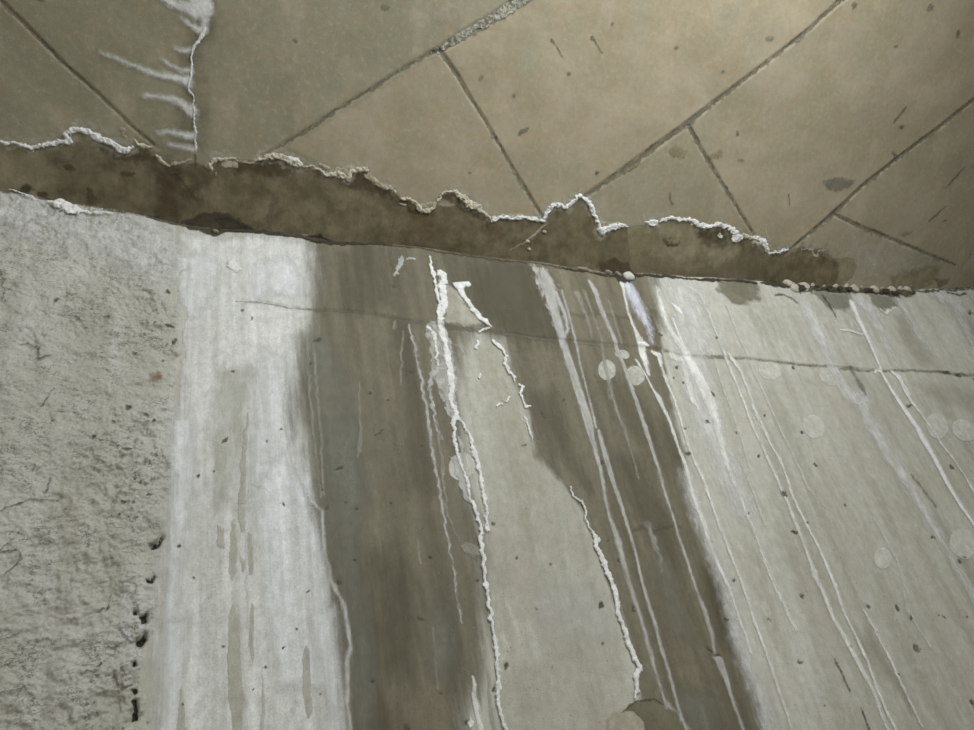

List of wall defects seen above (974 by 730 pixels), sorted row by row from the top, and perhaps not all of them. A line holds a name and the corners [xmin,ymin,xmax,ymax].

spalling [782,280,916,297]
damp [0,122,897,730]
damp [801,288,974,599]
spalling [113,662,149,730]
spalling [119,612,147,647]
damp [863,609,922,726]